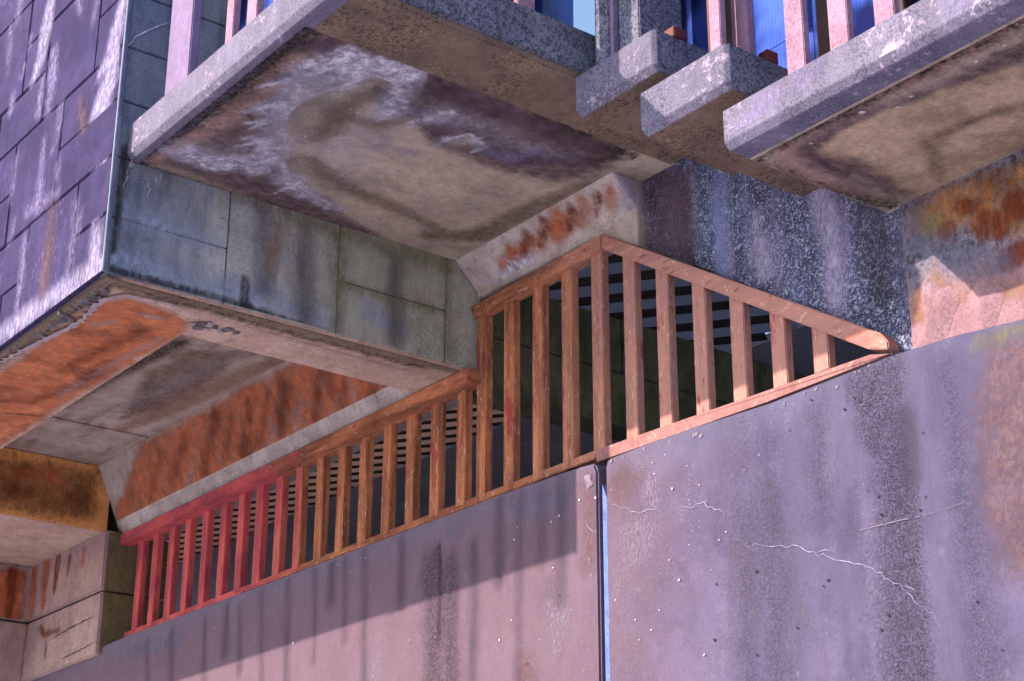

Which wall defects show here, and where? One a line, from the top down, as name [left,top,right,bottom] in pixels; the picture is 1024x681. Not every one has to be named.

damp [92,0,124,120]
damp [0,218,423,367]
damp [143,33,637,241]
corrosion [503,206,578,270]
damp [753,23,1024,307]
corrosion [914,161,1024,271]
corrosion [0,300,186,444]
corrosion [0,463,95,516]
corrosion [116,364,388,521]
corrosion [0,549,84,657]
crack [734,537,941,627]